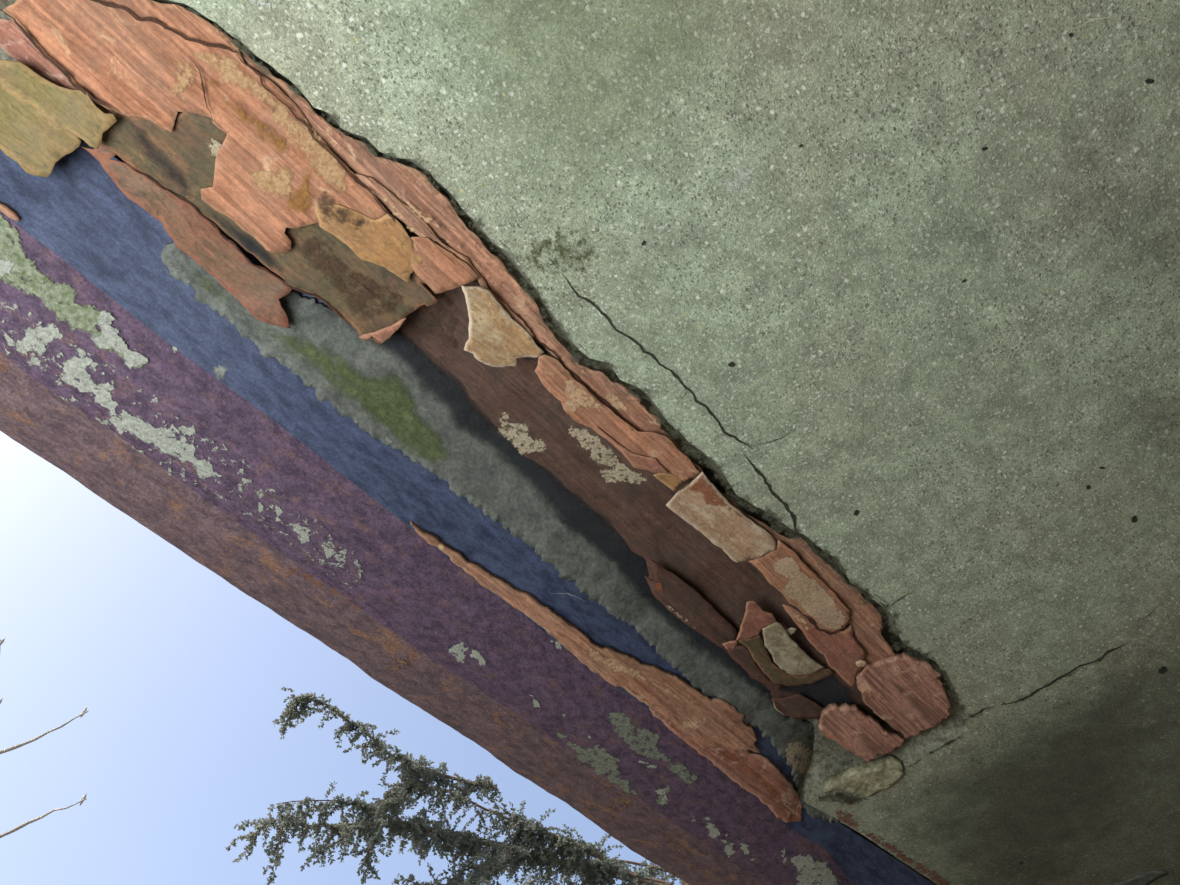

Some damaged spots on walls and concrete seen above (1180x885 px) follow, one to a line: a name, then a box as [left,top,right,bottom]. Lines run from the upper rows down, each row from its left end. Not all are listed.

spalling [0,0,16,20]
spalling [153,0,967,802]
crack [552,262,803,538]
crack [968,597,1177,720]